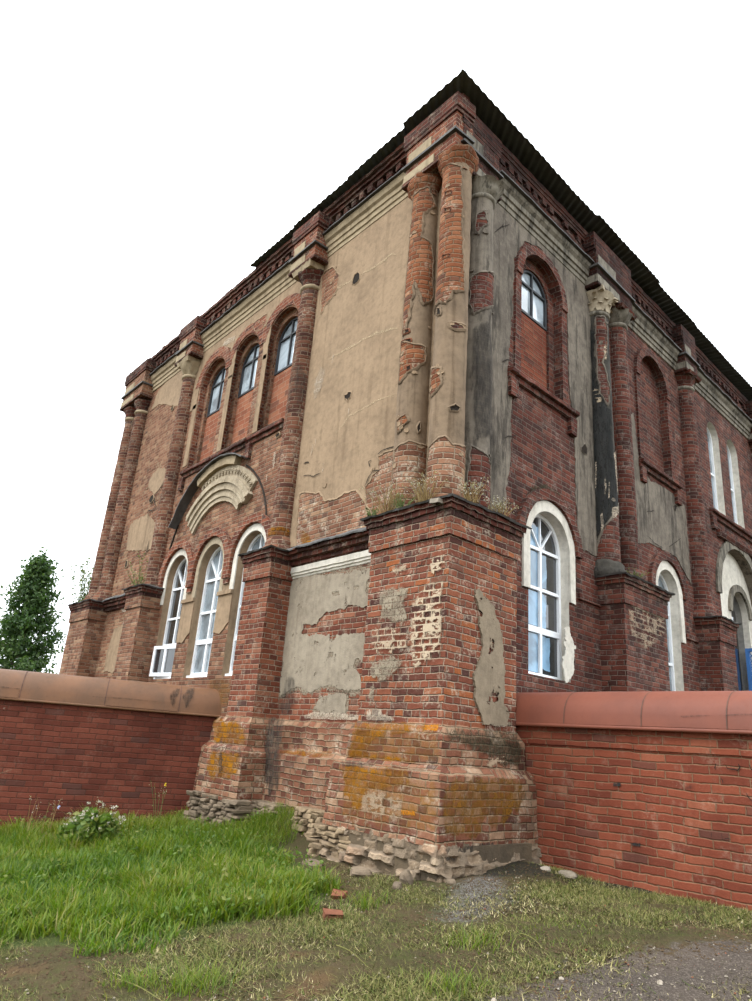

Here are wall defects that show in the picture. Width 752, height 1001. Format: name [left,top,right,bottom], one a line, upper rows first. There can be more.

flaking render [398,163,494,398]
flaking render [124,468,166,568]
flaking render [295,412,491,549]
water stain [516,484,583,559]
water stain [590,330,619,536]
flaking render [278,563,401,716]
flaking render [380,587,408,624]
flaking render [472,589,511,726]
water stain [362,792,401,816]
water stain [446,724,522,767]